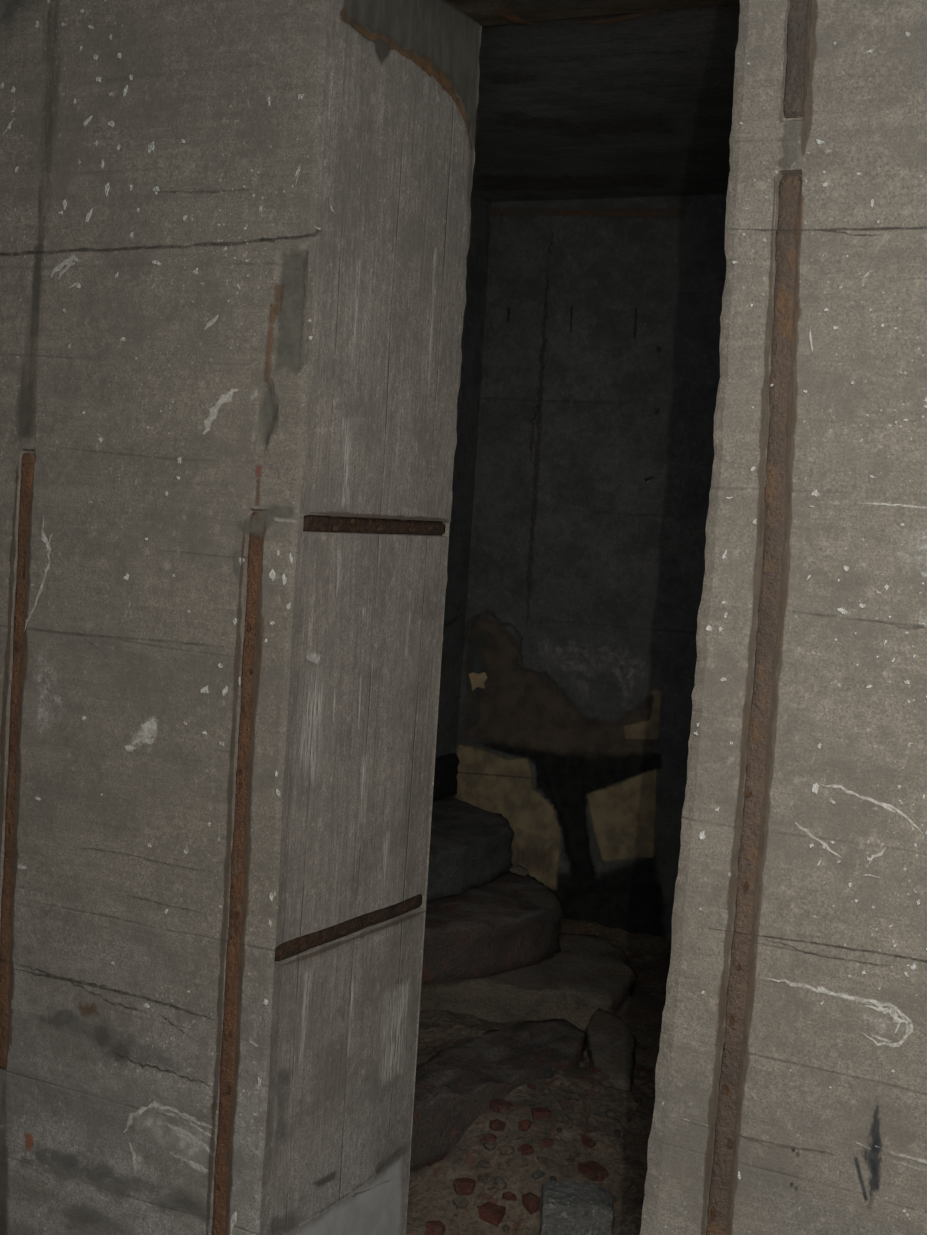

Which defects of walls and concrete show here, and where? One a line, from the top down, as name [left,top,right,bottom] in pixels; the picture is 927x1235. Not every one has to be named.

crack [0,230,322,256]
rust [303,511,449,535]
rust [701,0,817,1235]
rust [0,453,36,1069]
rust [206,467,266,1235]
rust [274,894,426,966]
crack [9,961,214,1037]
crack [112,1051,212,1086]